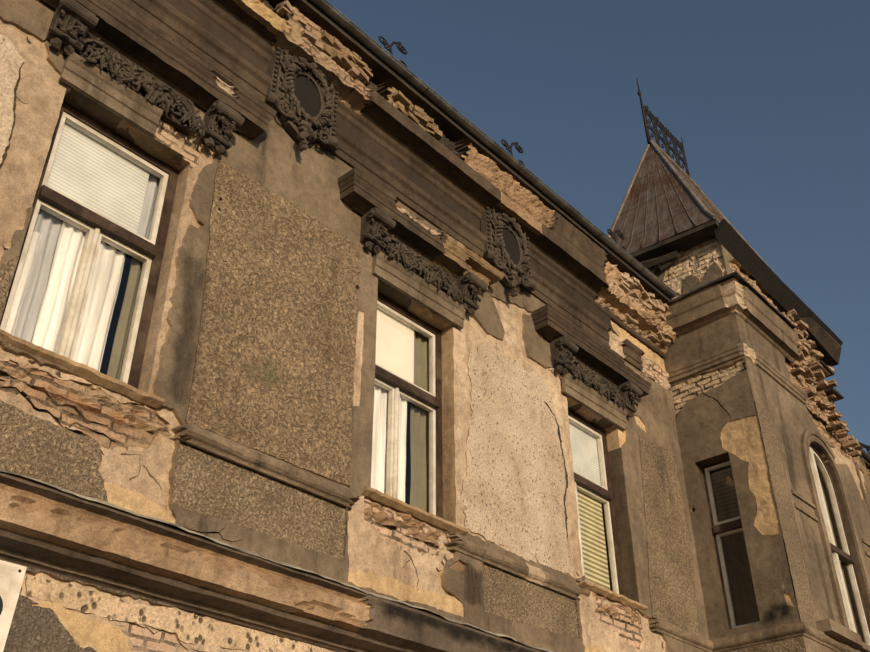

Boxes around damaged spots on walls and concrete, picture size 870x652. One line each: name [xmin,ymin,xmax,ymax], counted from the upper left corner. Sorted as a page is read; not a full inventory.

flaking render [233,0,369,85]
crack [0,62,28,169]
flaking render [0,16,72,264]
flaking render [0,119,219,524]
flaking render [347,292,669,652]
crack [544,401,570,558]
flaking render [671,358,747,418]
flaking render [610,239,809,372]
crack [691,382,732,419]
flaking render [720,415,782,535]
flaking render [784,352,867,501]
flaking render [20,570,339,652]